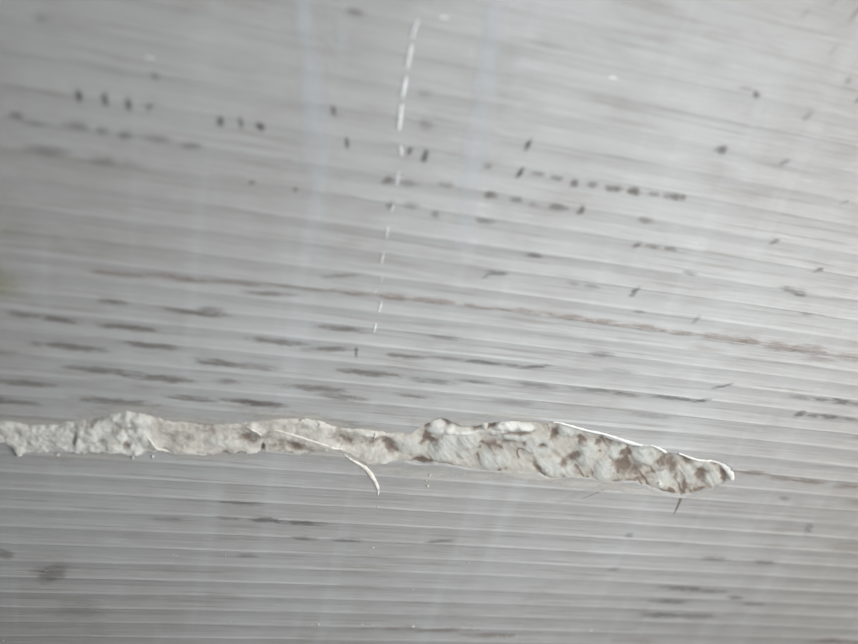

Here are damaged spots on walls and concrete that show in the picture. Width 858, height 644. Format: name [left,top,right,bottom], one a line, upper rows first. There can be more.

spalling [0,406,734,514]